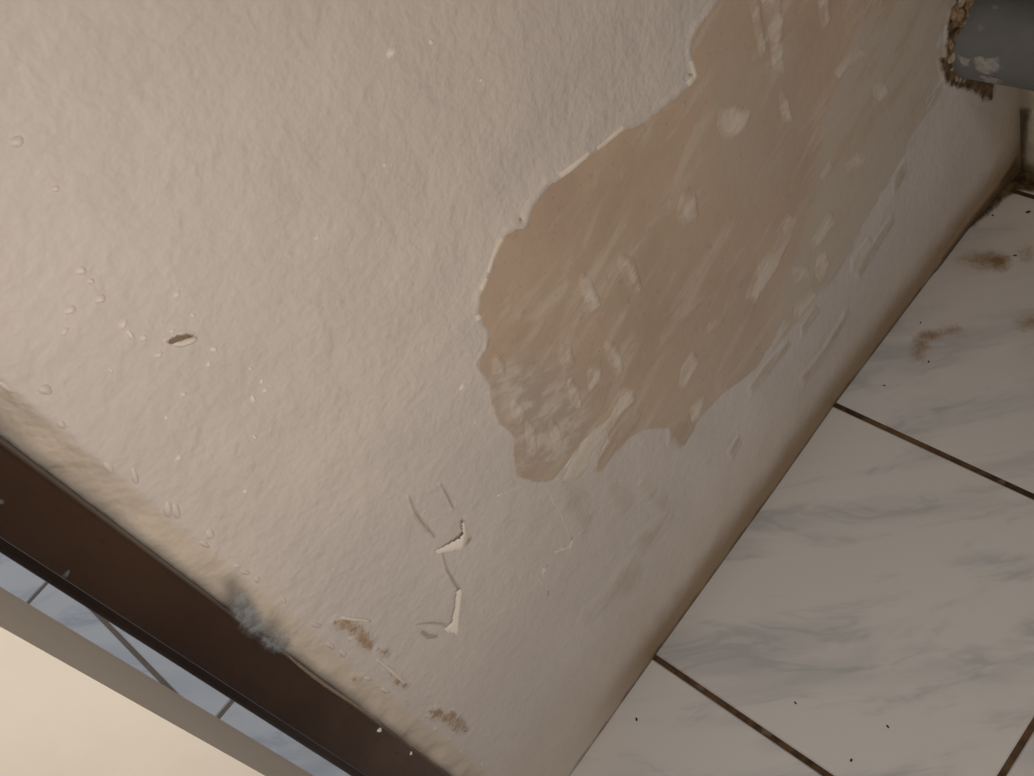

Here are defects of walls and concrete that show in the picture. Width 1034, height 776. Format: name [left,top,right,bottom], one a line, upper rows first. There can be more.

peeling [433,0,997,524]